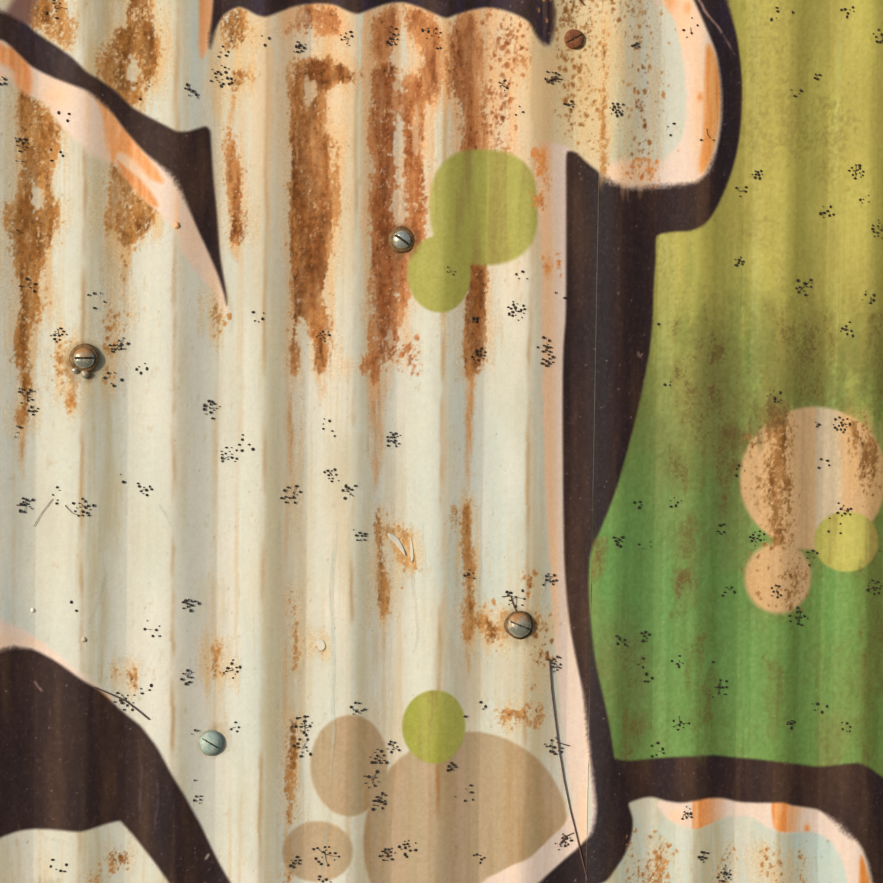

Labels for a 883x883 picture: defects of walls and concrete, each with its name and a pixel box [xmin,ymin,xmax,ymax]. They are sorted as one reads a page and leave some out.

corrosion [33,0,176,116]
corrosion [0,85,171,482]
corrosion [210,0,679,660]
corrosion [438,267,569,743]
corrosion [737,396,822,622]
corrosion [834,399,883,522]
corrosion [622,826,681,883]
corrosion [702,835,817,883]